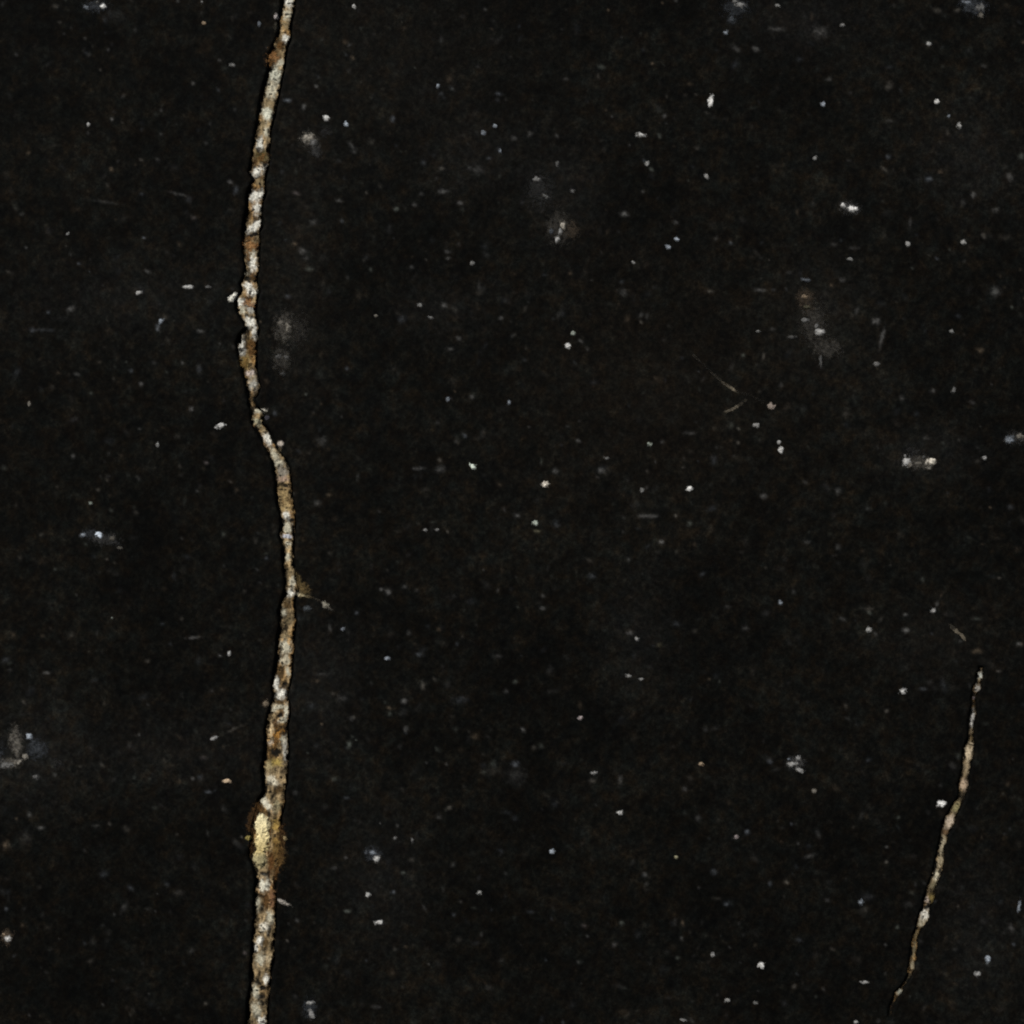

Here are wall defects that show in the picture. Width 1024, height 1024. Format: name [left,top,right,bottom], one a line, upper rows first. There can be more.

crack [228,0,331,1024]
crack [896,672,982,995]